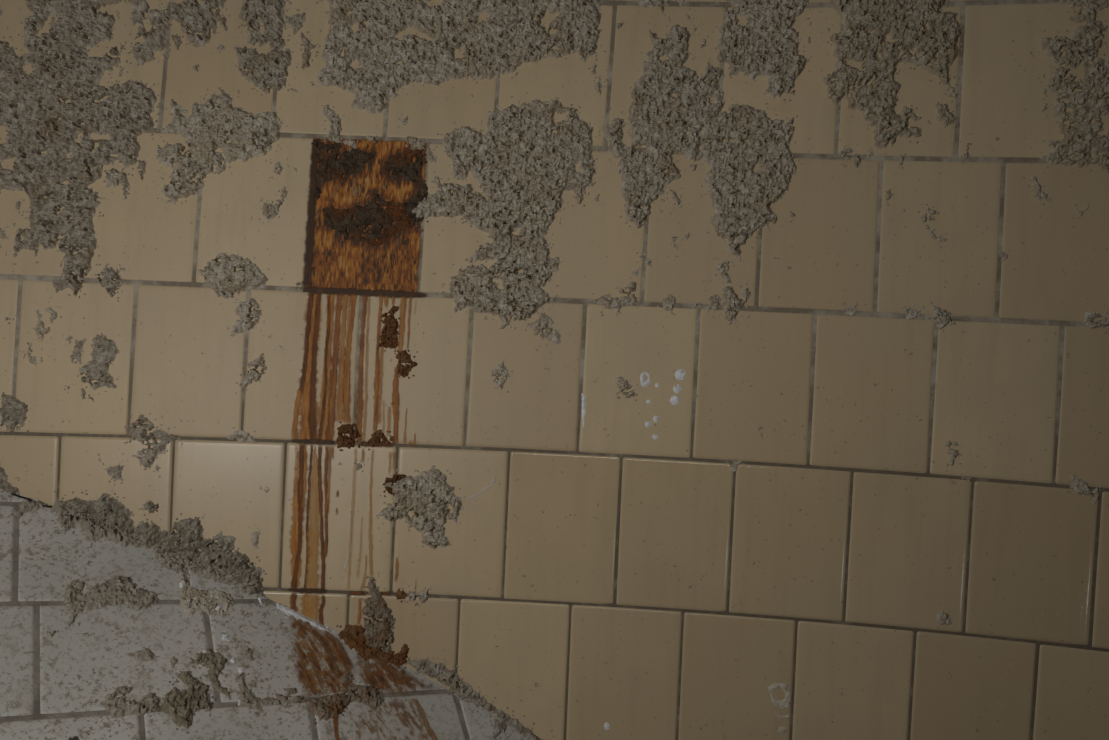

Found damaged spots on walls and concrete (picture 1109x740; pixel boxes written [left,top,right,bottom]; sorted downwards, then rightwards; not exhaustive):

corrosion [288,126,437,740]
peeling [98,458,124,485]
peeling [139,500,159,516]